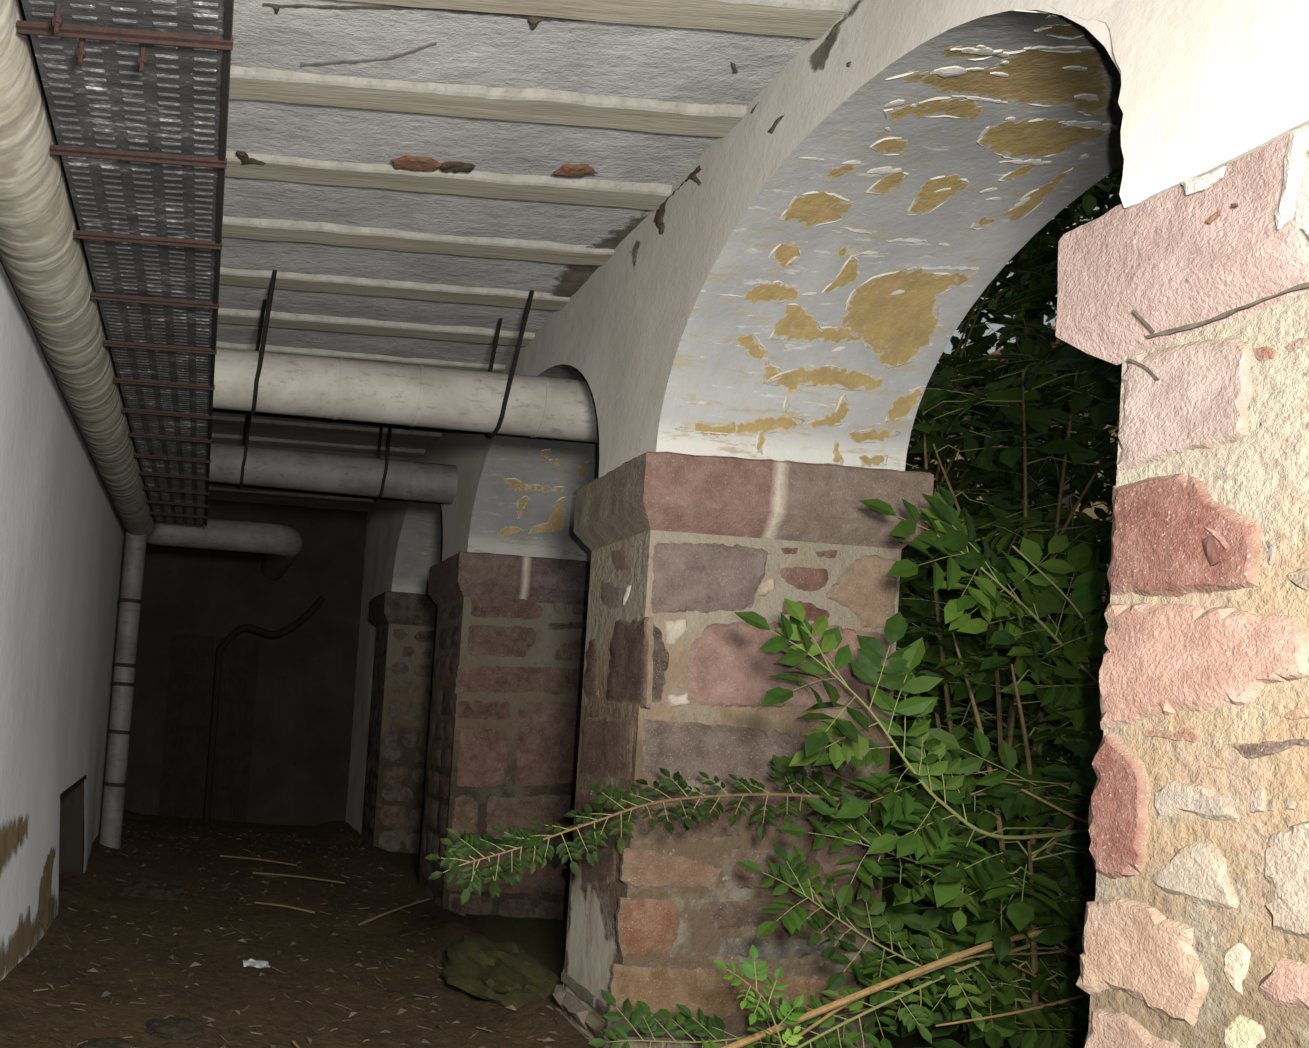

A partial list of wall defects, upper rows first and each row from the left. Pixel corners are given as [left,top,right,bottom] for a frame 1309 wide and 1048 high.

peeling [674,0,1119,468]
peeling [497,478,566,536]